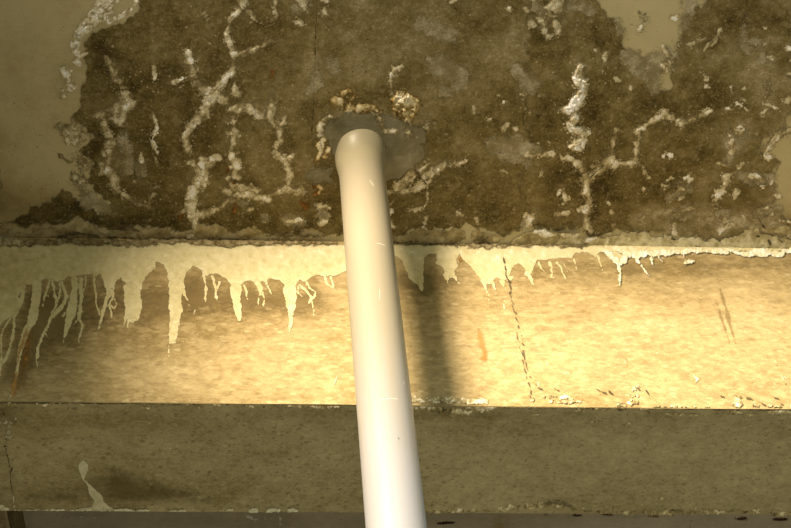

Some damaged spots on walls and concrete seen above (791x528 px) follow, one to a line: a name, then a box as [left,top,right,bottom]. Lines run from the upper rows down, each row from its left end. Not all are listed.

leakage [0,0,791,381]
crack [393,236,536,408]
leakage [0,460,150,520]
crack [0,402,195,493]